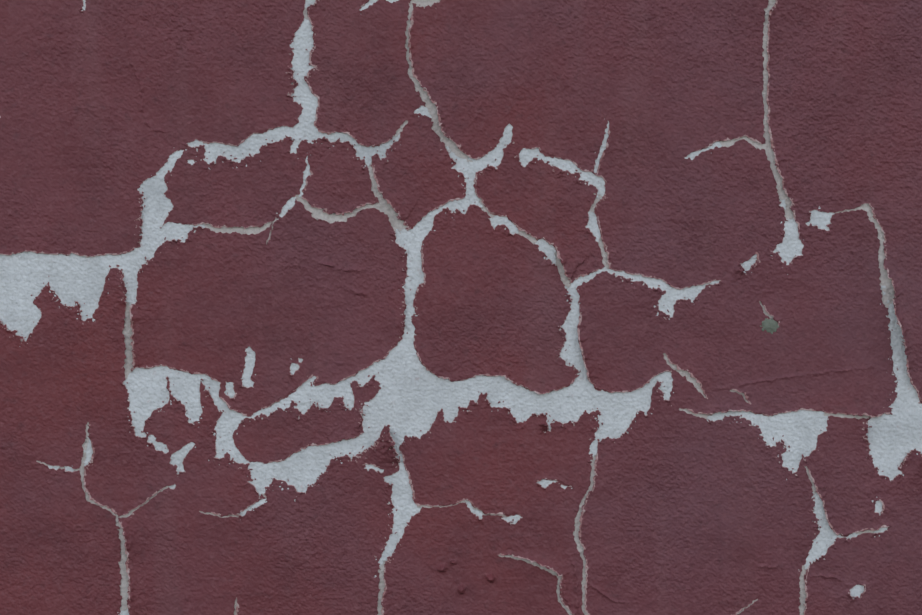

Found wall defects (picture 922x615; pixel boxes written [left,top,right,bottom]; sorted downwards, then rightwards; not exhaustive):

crack [266,156,385,244]
crack [359,0,478,162]
crack [684,0,804,275]
peeling [0,0,720,615]
crack [663,353,706,398]
crack [730,388,750,403]
peeling [679,204,922,615]
crack [37,422,176,615]
crack [417,500,522,524]
crack [499,455,597,615]